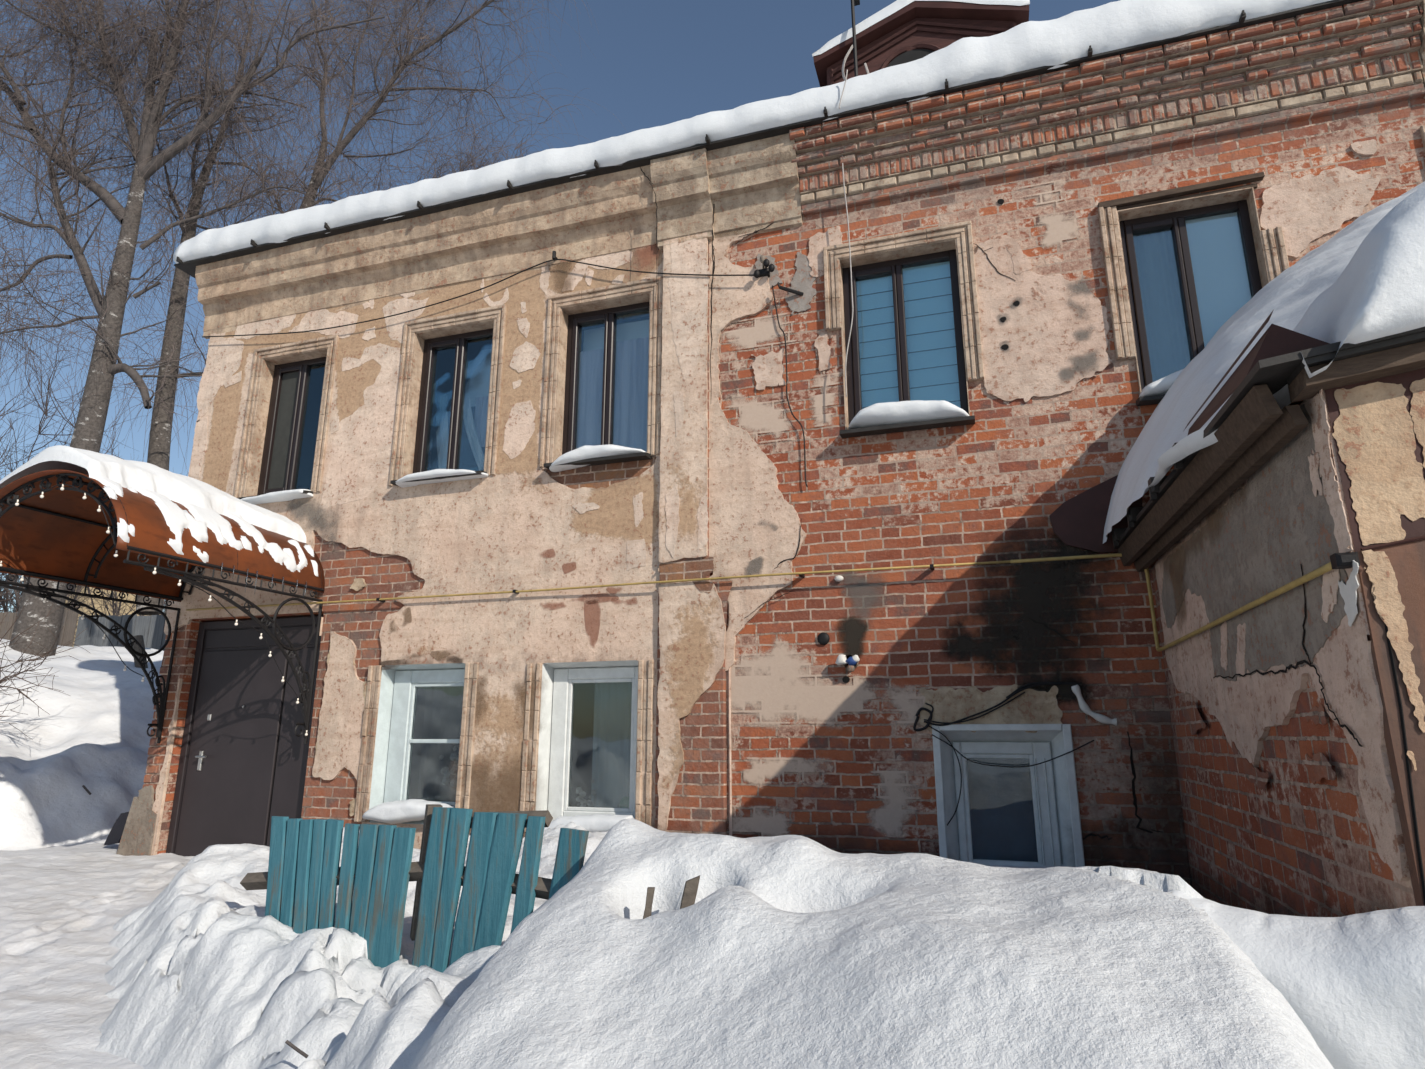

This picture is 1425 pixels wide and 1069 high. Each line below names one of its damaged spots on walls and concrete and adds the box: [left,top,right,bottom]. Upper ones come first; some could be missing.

peeling [190,292,429,514]
peeling [668,239,710,437]
peeling [751,348,786,391]
peeling [973,235,1112,403]
flaking render [301,531,462,830]
leakage [726,573,929,737]
leakage [943,530,1105,702]
peeling [1304,378,1425,733]
leakage [727,793,794,837]
leakage [727,753,833,787]
leakage [869,755,921,837]
crack [1082,732,1163,840]